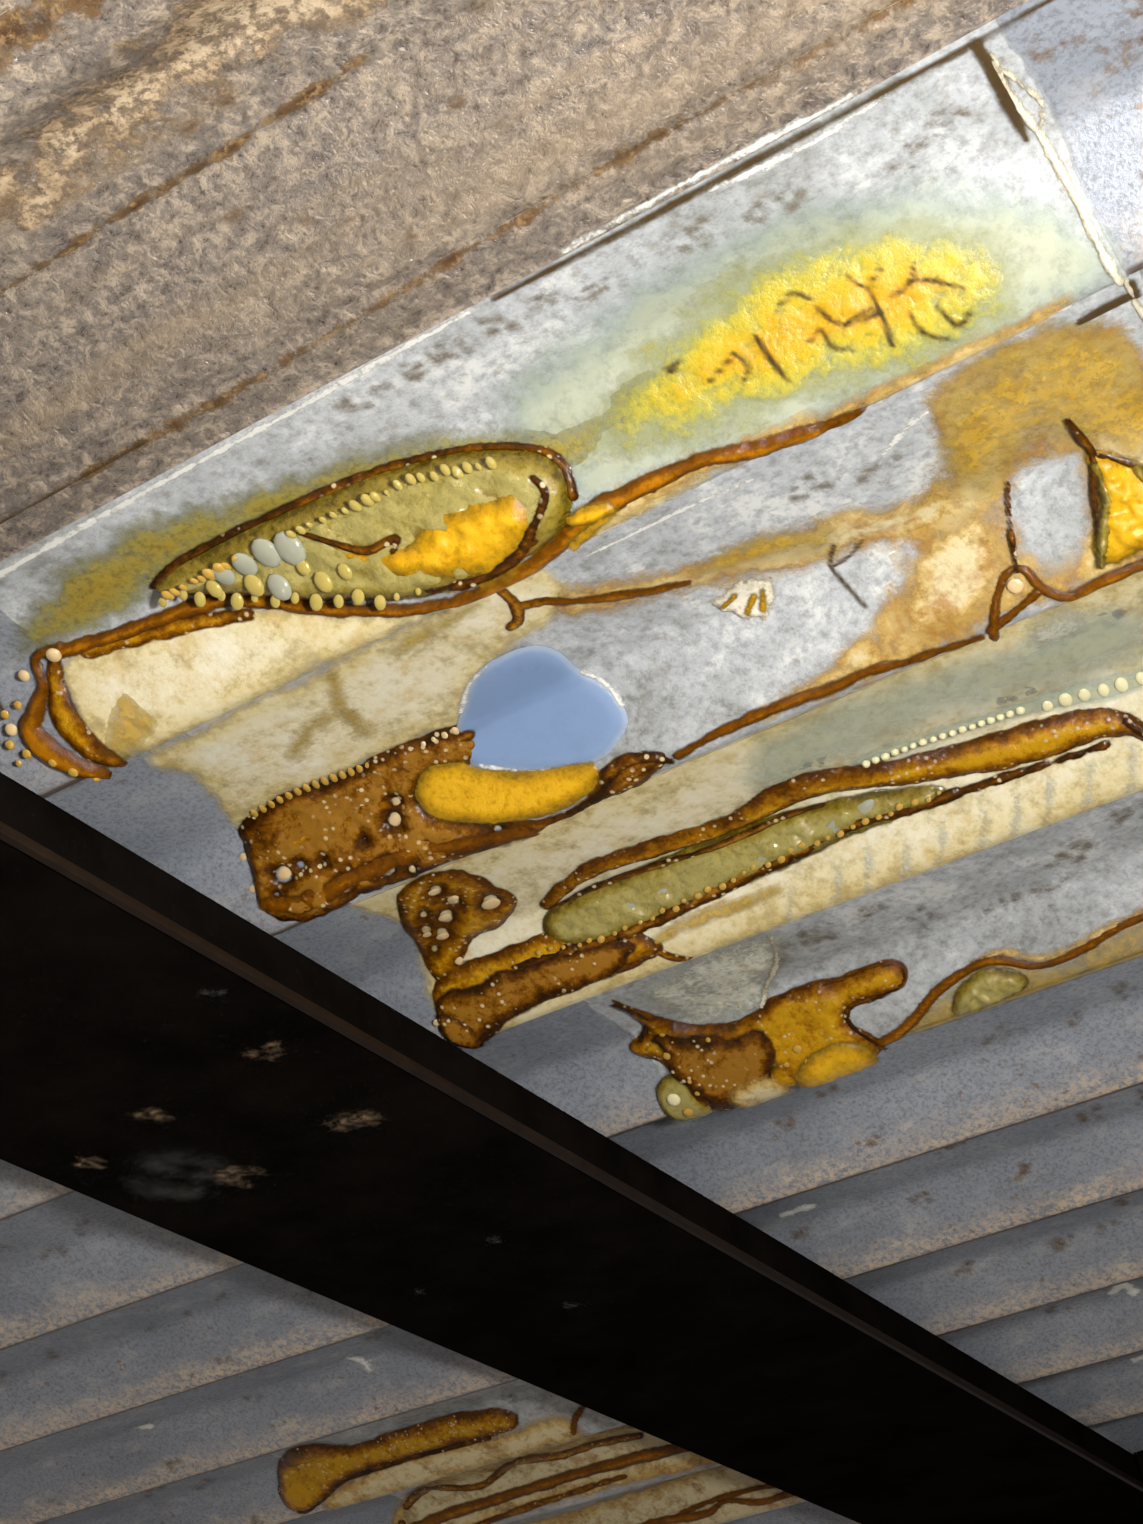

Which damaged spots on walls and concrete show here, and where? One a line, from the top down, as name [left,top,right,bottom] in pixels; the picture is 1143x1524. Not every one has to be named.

rust [0,0,102,75]
damp [0,198,1143,1121]
damp [277,1405,806,1524]